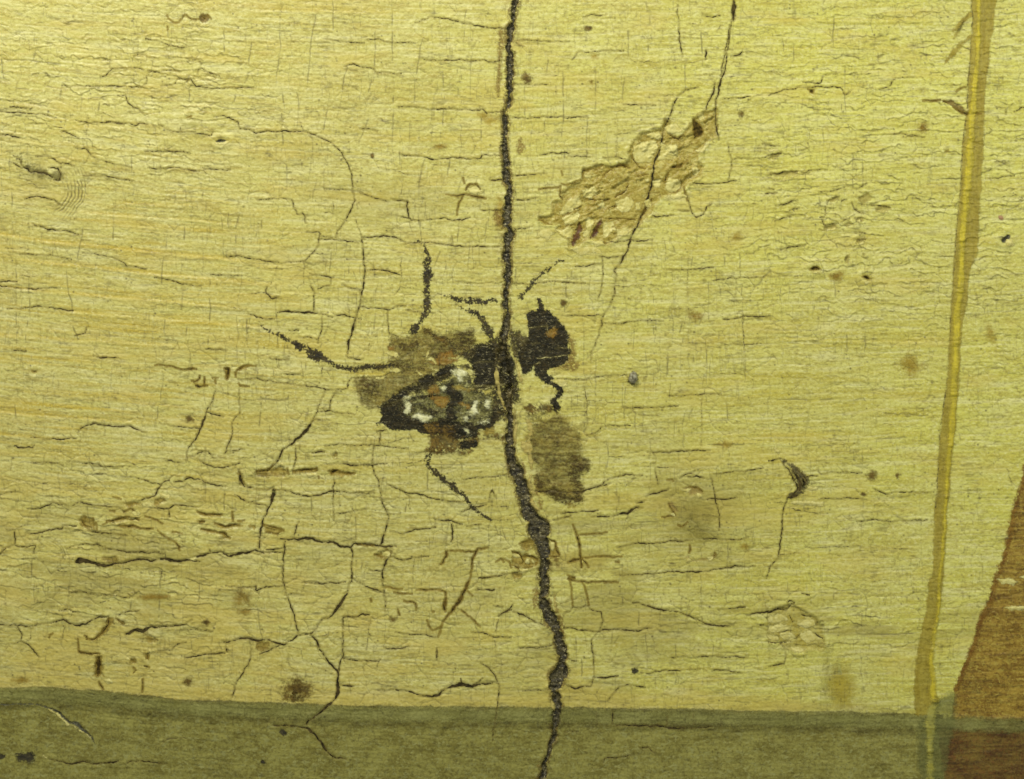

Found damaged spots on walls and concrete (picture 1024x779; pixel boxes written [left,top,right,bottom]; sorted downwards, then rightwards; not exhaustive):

crack [2,95,212,201]
peeling [537,108,718,255]
crack [0,247,87,336]
crack [52,0,859,779]
crack [14,423,142,463]
crack [0,525,77,559]
crack [0,591,139,656]